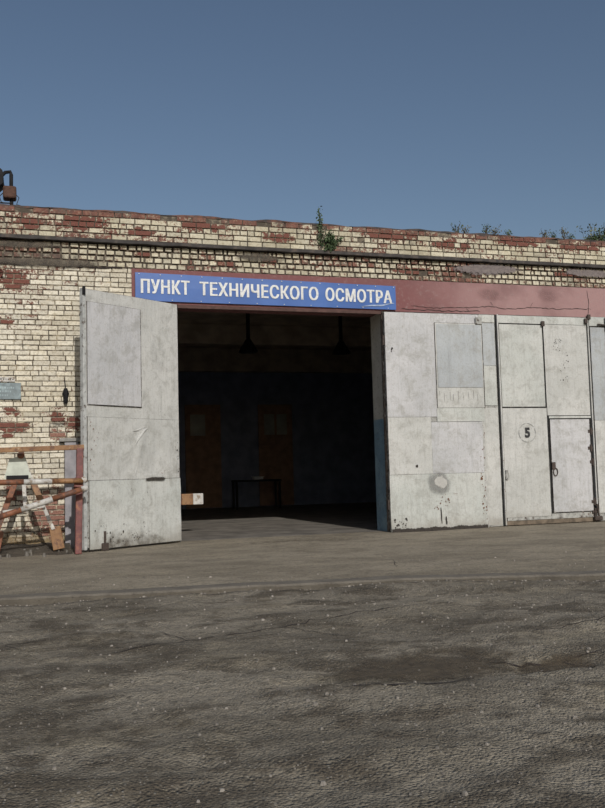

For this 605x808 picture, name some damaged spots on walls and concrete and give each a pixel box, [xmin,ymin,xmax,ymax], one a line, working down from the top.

peeling [0,212,110,233]
peeling [124,224,156,239]
peeling [178,217,231,233]
peeling [262,232,295,243]
peeling [360,229,417,244]
peeling [430,238,471,252]
peeling [495,236,538,247]
peeling [559,242,599,254]
peeling [0,268,30,294]
peeling [0,407,36,438]